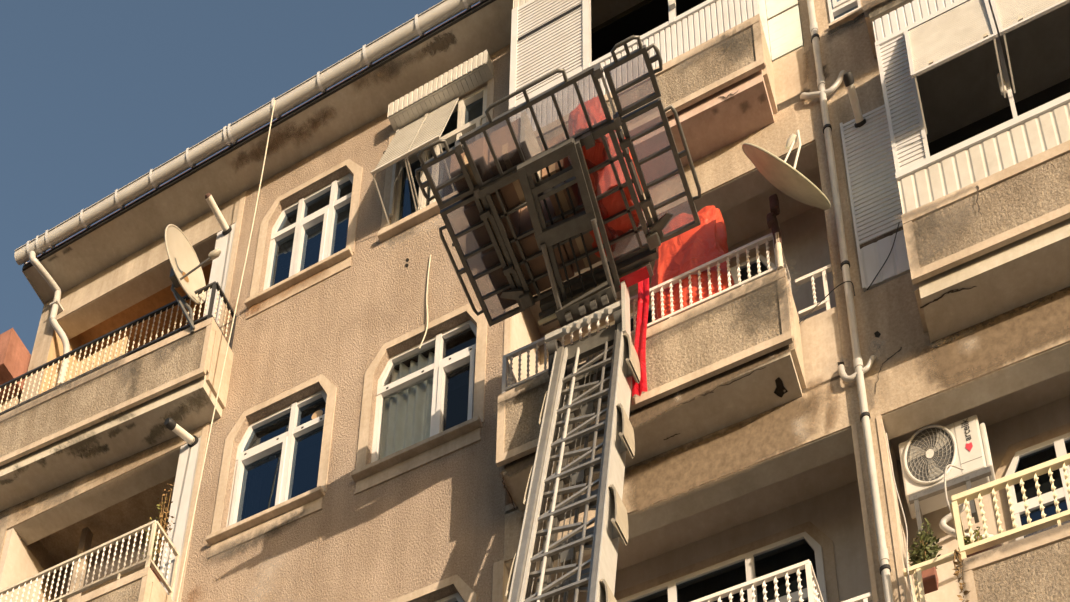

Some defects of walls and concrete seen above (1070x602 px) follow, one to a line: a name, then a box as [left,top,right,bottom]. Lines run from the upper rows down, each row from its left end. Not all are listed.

crack [920,286,976,308]
spalling [629,343,793,428]
crack [664,367,765,440]
crack [875,347,902,393]
spalling [503,452,536,476]